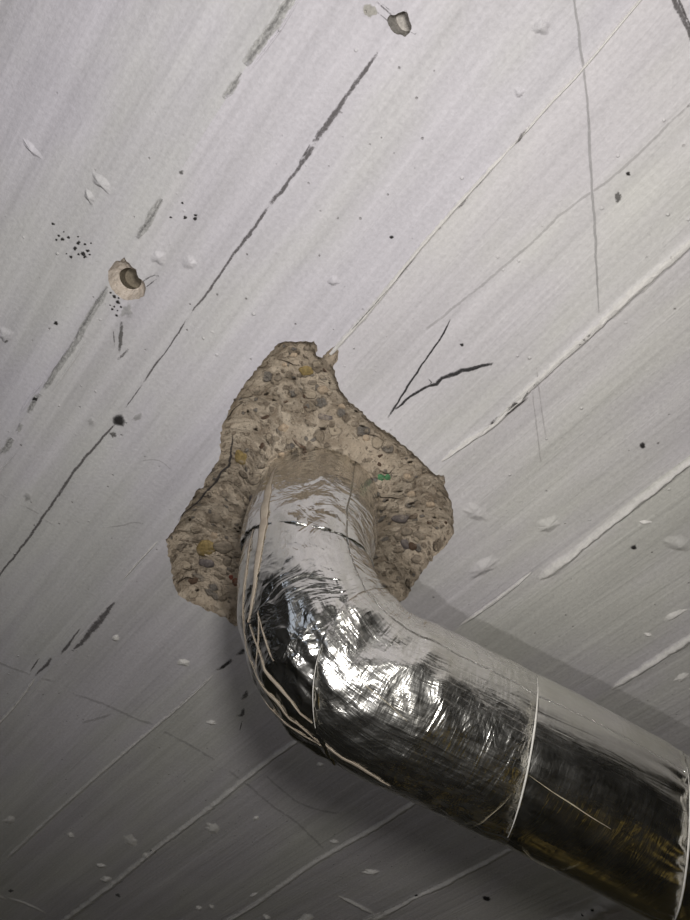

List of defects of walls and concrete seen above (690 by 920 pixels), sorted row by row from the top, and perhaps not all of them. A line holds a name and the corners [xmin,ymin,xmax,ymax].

crack [127,58,374,405]
crack [422,0,690,332]
crack [0,426,113,575]
spalling [166,341,454,626]